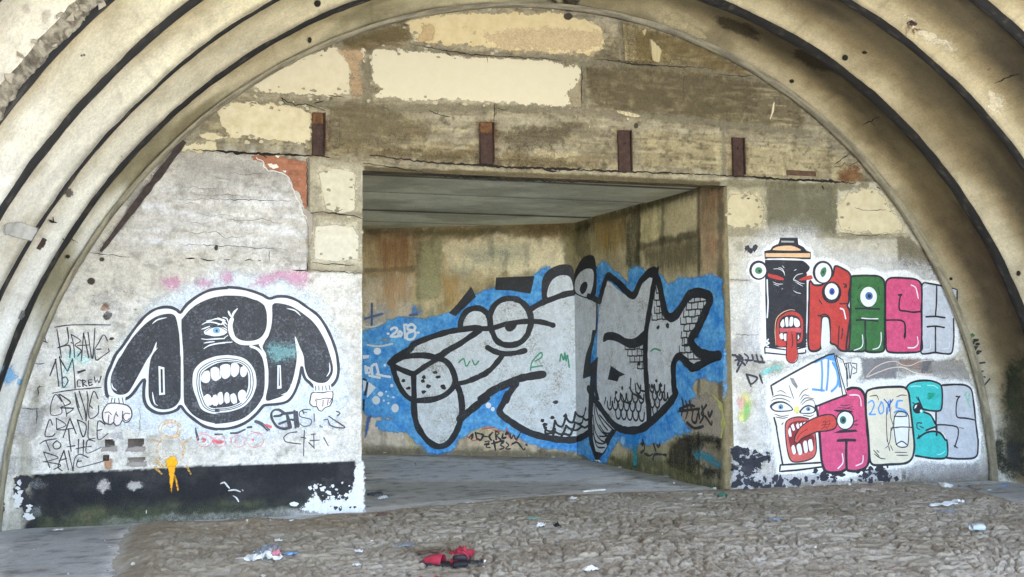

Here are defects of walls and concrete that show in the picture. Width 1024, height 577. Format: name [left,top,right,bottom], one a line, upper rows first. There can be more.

spalling [0,0,106,121]
corrosion [312,112,324,124]
peeling [182,8,605,267]
crack [364,154,906,236]